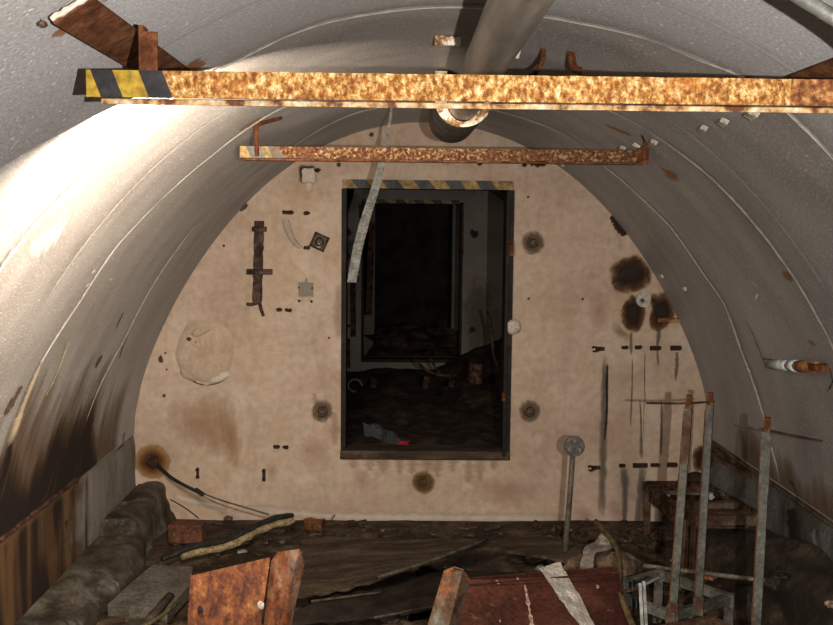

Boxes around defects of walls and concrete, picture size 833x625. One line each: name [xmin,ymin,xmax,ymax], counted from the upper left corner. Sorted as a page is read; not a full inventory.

damp [0,364,119,499]
damp [742,440,760,470]
corrosion [0,480,84,625]